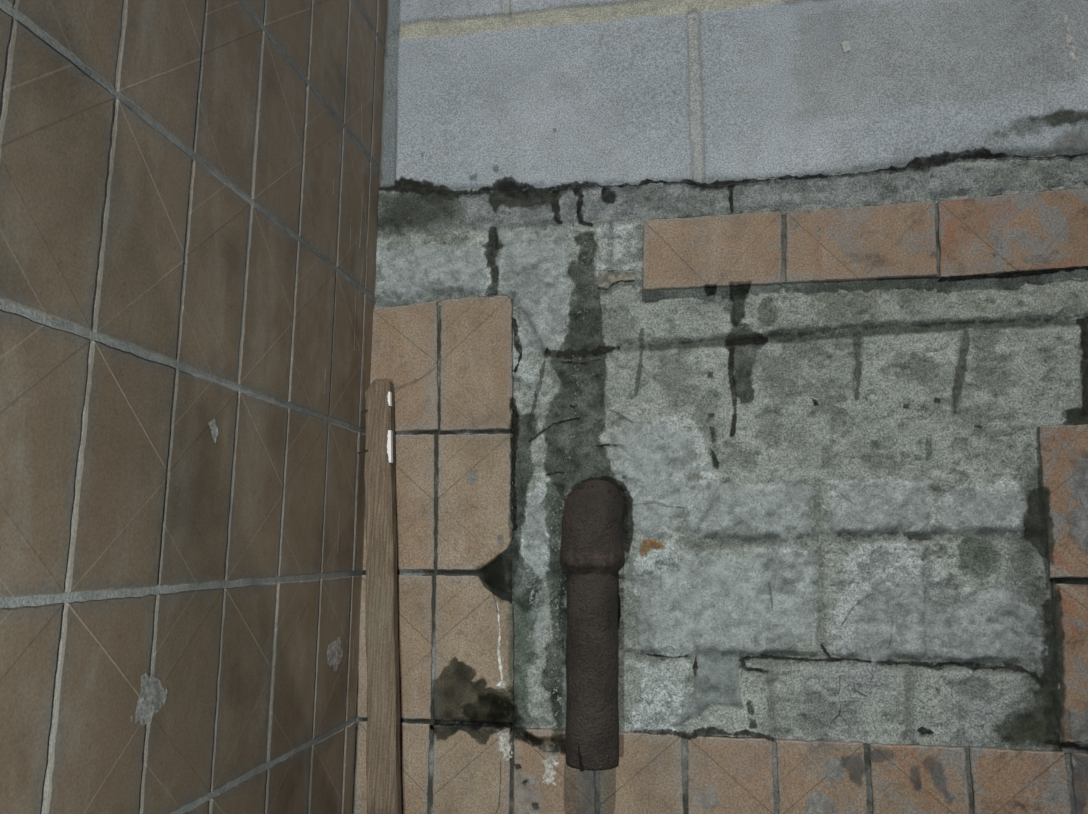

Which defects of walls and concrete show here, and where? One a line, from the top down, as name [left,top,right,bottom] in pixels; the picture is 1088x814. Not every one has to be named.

crack [379,147,1088,227]
leakage [705,284,717,296]
leakage [725,281,768,437]
leakage [432,227,614,786]
flaking render [374,154,1088,751]
crack [633,727,775,741]
crack [739,589,1043,732]
crack [917,726,934,734]